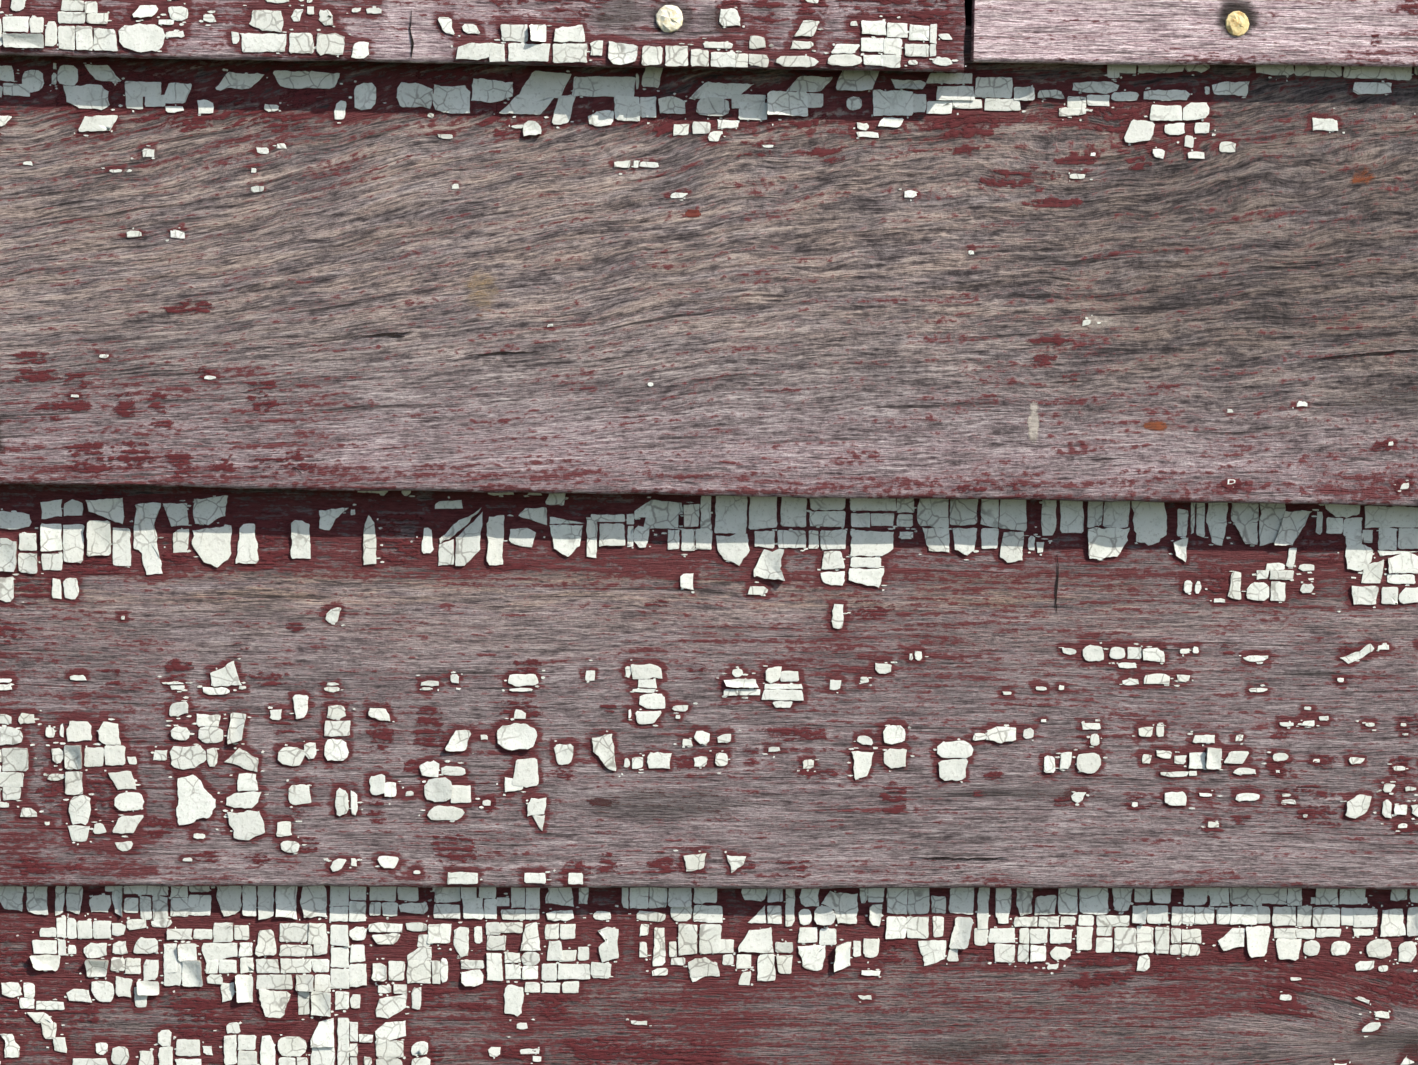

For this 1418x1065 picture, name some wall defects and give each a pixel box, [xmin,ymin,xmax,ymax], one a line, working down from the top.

peeling [0,0,1418,159]
peeling [0,495,259,603]
peeling [410,479,1418,612]
peeling [625,664,698,727]
peeling [717,665,804,708]
peeling [1059,642,1199,687]
peeling [0,658,394,854]
peeling [335,709,546,831]
peeling [592,730,741,777]
peeling [847,725,915,780]
peeling [933,719,1046,783]
peeling [1132,723,1288,809]